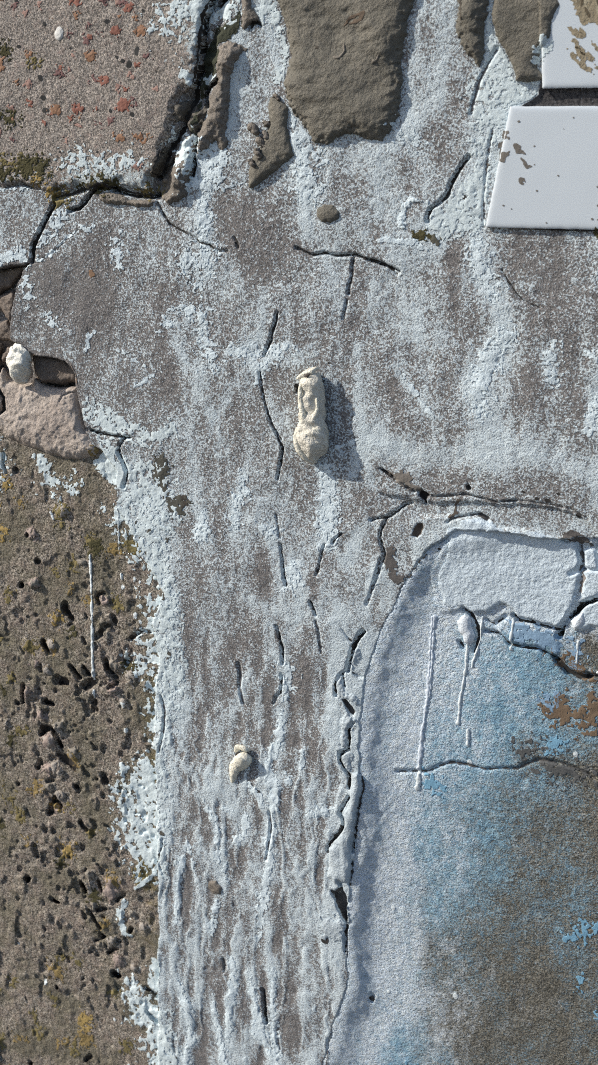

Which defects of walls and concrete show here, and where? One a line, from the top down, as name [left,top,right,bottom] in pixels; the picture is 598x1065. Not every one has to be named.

crack [31,0,238,263]
peeling [485,120,535,185]
spalling [0,266,27,362]
spalling [33,354,78,386]
leakage [154,182,299,386]
crack [260,313,284,479]
crack [297,247,400,318]
leakage [308,438,359,551]
crack [460,598,598,679]
leakage [247,660,306,948]
crack [328,728,365,886]
leakage [209,956,282,1065]